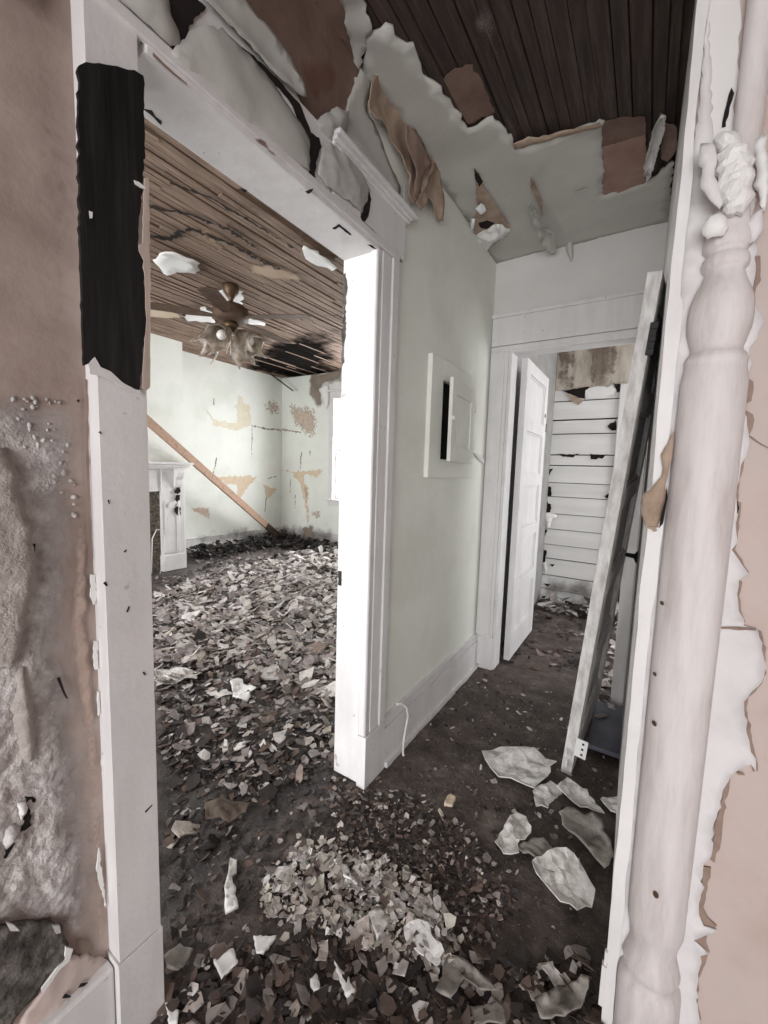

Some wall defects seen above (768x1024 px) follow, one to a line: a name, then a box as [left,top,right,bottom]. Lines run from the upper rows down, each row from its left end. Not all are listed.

flaking render [246,0,363,120]
flaking render [443,64,495,124]
flaking render [602,116,646,195]
peeling [669,0,768,439]
leakage [559,352,575,387]
leakage [591,346,617,382]
peeling [0,357,141,1024]
peeling [563,463,671,1018]
peeling [677,306,768,1024]